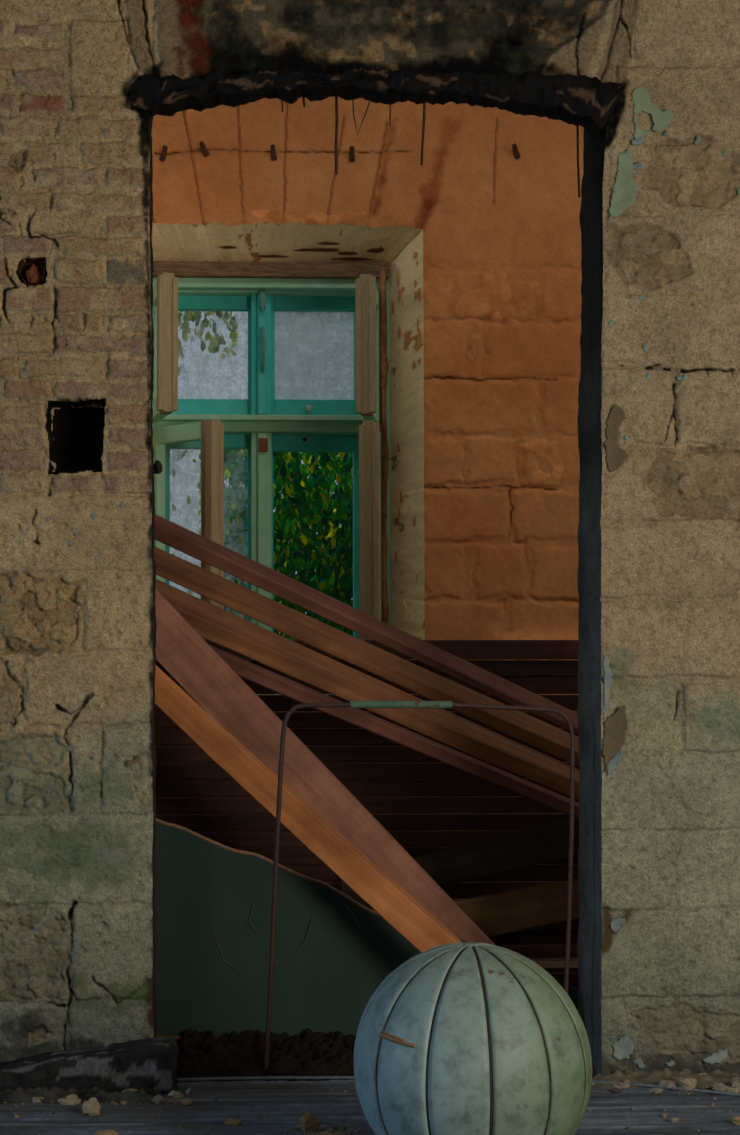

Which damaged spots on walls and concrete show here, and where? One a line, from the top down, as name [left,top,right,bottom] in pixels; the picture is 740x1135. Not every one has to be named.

crack [0,196,59,246]
flaking render [609,87,740,291]
crack [3,259,18,323]
crack [50,287,58,338]
crack [620,364,734,447]
peeling [602,655,628,776]
crack [48,901,144,1050]